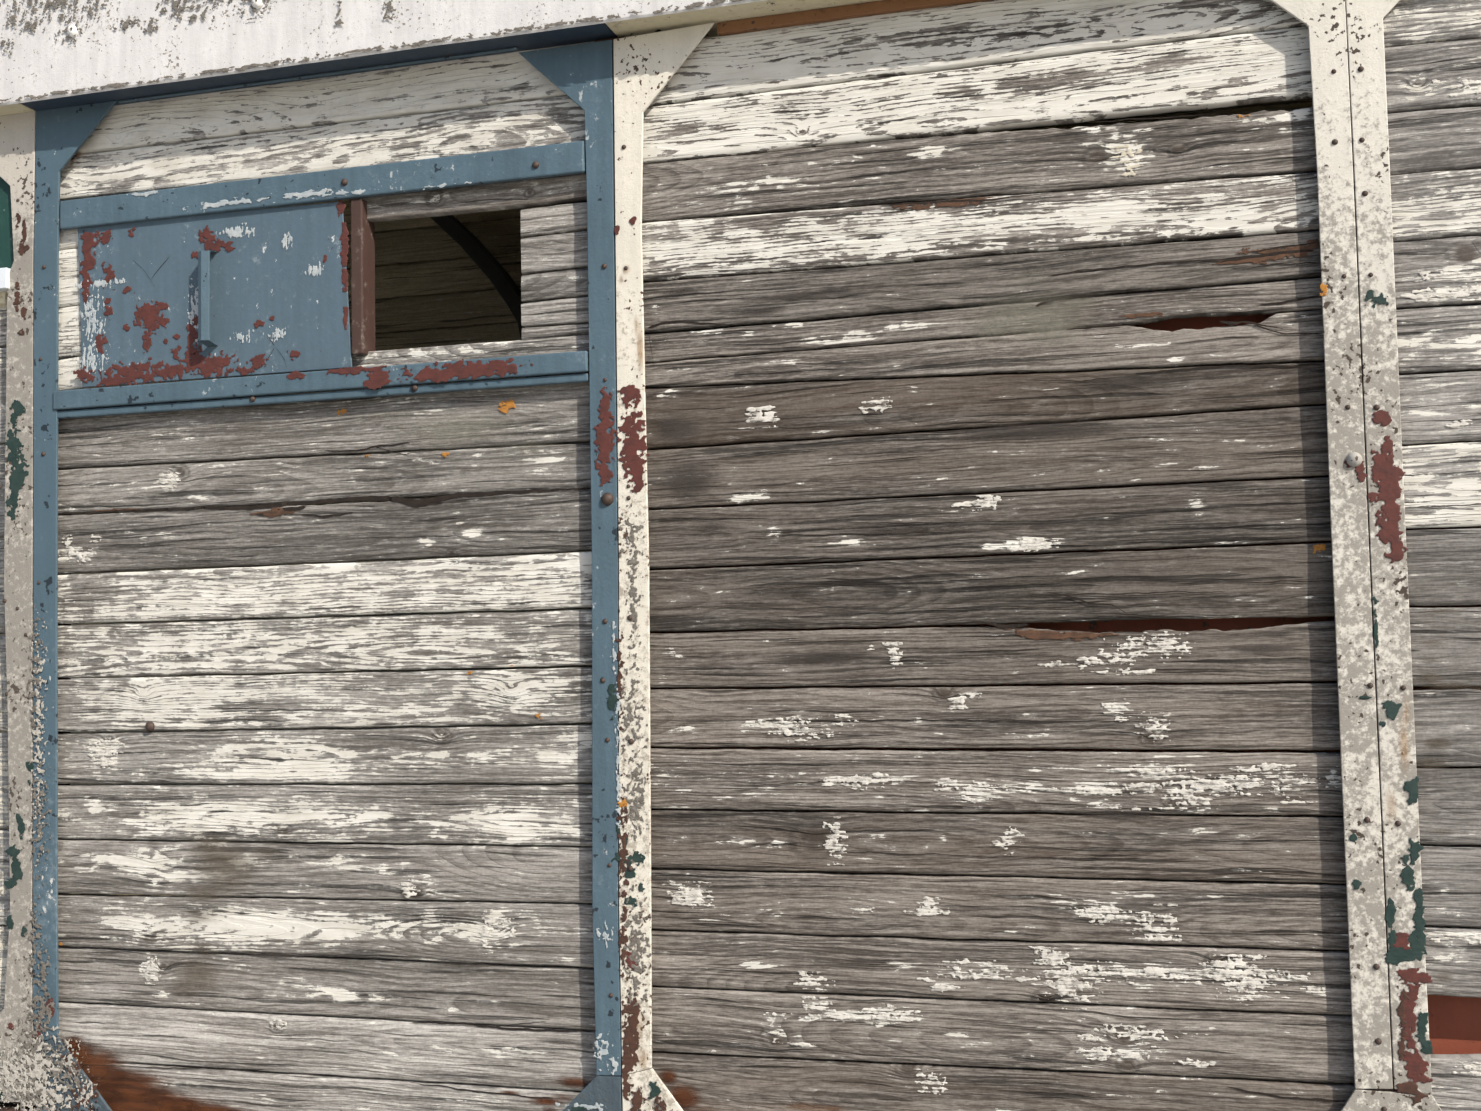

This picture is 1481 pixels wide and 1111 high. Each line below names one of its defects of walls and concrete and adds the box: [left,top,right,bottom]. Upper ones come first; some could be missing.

peeling [71,227,306,387]
crack [1035,239,1322,382]
peeling [5,400,30,520]
peeling [1344,410,1409,567]
crack [943,580,1327,641]
peeling [1037,631,1192,675]
peeling [0,597,101,1111]
peeling [1071,903,1182,942]
peeling [916,946,1326,1010]
rust [66,1037,240,1111]
rust [536,1078,588,1111]
rust [662,1071,705,1111]